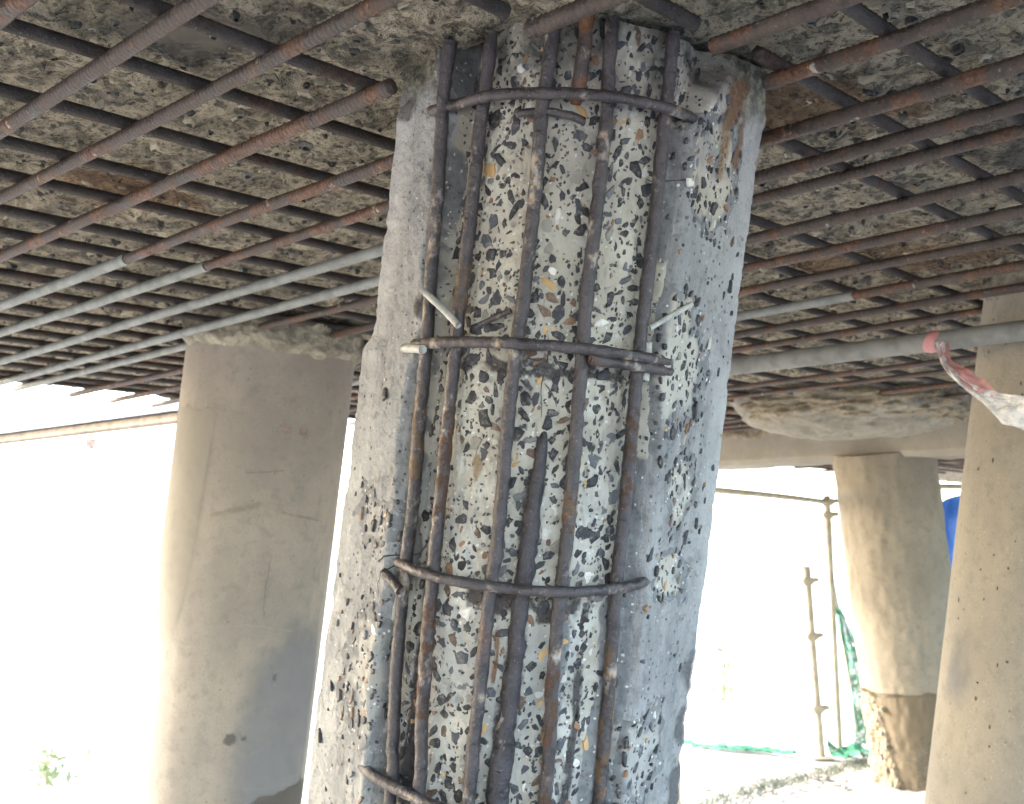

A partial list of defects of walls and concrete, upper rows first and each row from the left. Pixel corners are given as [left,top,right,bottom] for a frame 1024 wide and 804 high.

spalling [72,21,99,44]
spalling [869,1,924,26]
spalling [922,36,999,69]
spalling [88,73,136,110]
spalling [823,68,917,96]
spalling [107,110,214,190]
spalling [275,128,367,170]
spalling [812,120,878,152]
spalling [154,160,352,232]
spalling [182,265,307,313]
spalling [734,200,1022,353]
spalling [62,279,178,399]